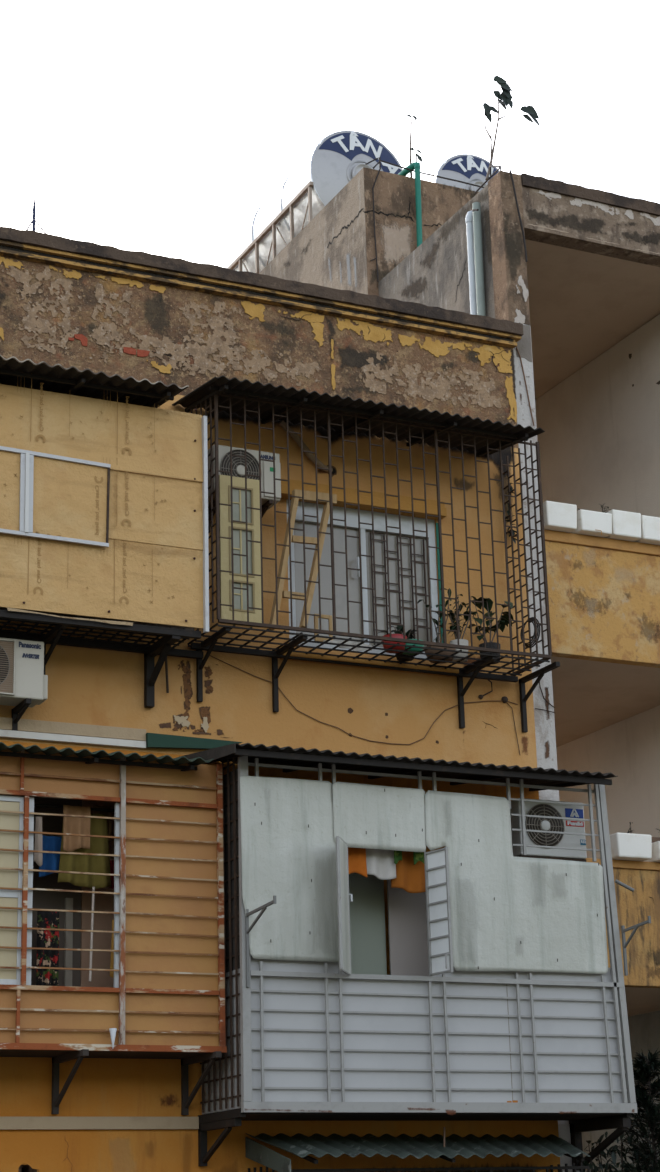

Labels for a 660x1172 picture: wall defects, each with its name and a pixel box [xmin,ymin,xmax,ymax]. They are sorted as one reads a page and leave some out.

crack [327,201,442,248]
peeling [537,190,660,226]
peeling [514,275,529,324]
peeling [0,256,517,422]
flaking render [172,660,216,733]